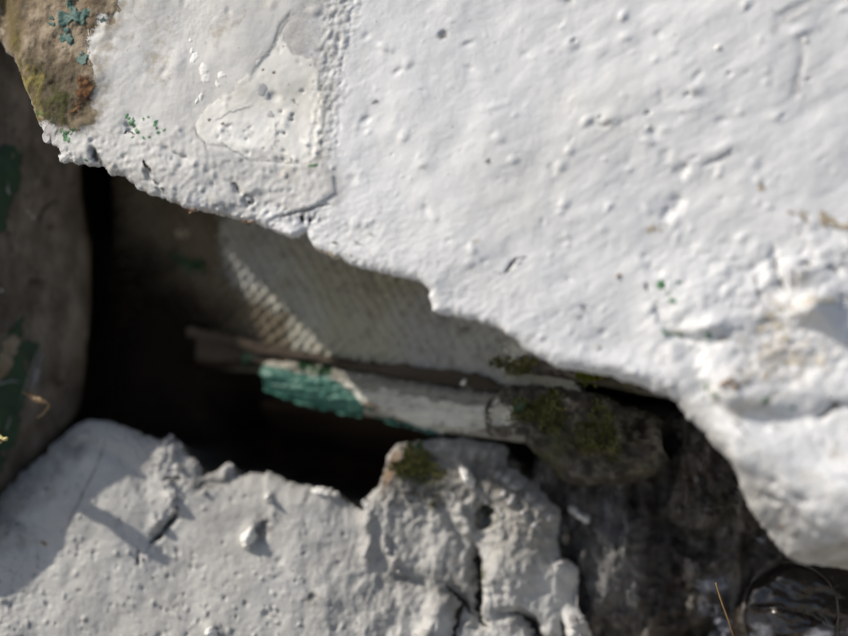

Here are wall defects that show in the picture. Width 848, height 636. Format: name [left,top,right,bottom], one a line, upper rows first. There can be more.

peeling [0,0,121,144]
peeling [189,6,325,167]
crack [445,542,566,636]